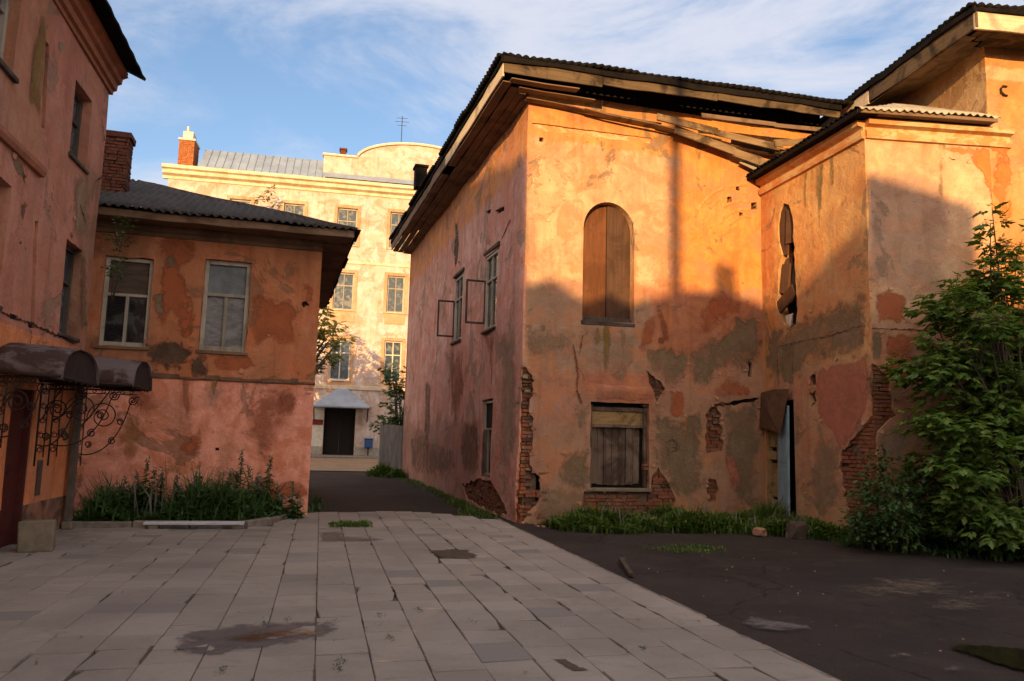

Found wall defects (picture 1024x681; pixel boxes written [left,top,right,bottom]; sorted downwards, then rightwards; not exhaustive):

peeling [946,136,1012,222]
peeling [153,238,195,341]
crack [573,332,588,404]
flaking render [461,286,914,528]
crack [715,360,757,405]